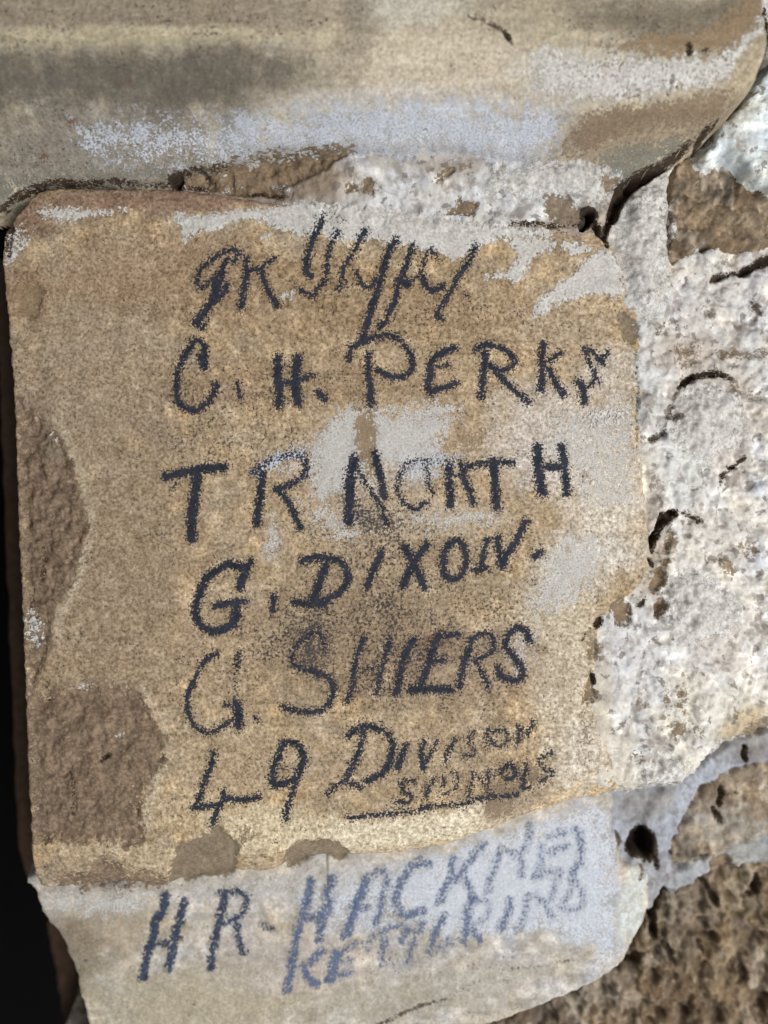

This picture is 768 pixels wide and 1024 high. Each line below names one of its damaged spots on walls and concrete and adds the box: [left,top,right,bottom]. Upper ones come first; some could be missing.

efflorescence [70,95,563,174]
crack [602,118,720,238]